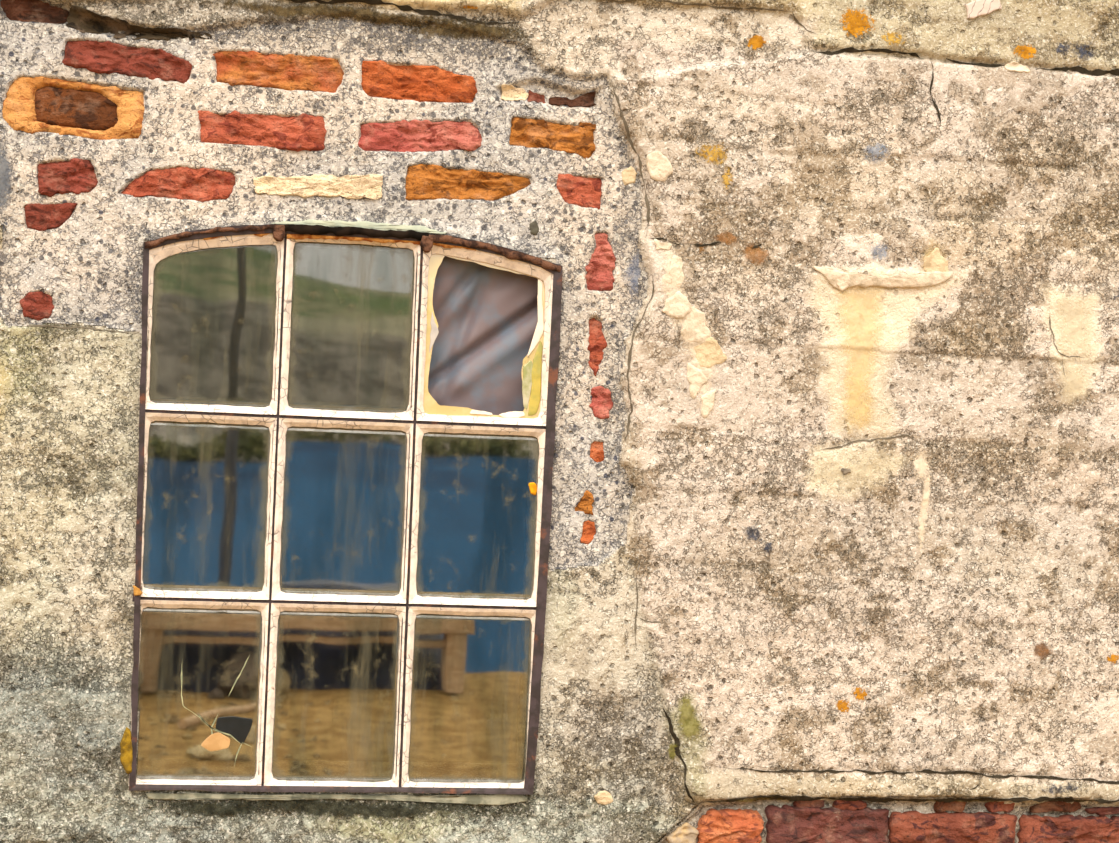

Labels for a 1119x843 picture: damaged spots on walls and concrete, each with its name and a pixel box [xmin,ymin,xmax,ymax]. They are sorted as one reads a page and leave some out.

crack [611,0,1004,123]
crack [1036,66,1119,76]
crack [611,79,720,247]
spalling [0,0,673,571]
crack [622,276,654,444]
peeling [654,239,727,418]
crack [662,706,1119,804]